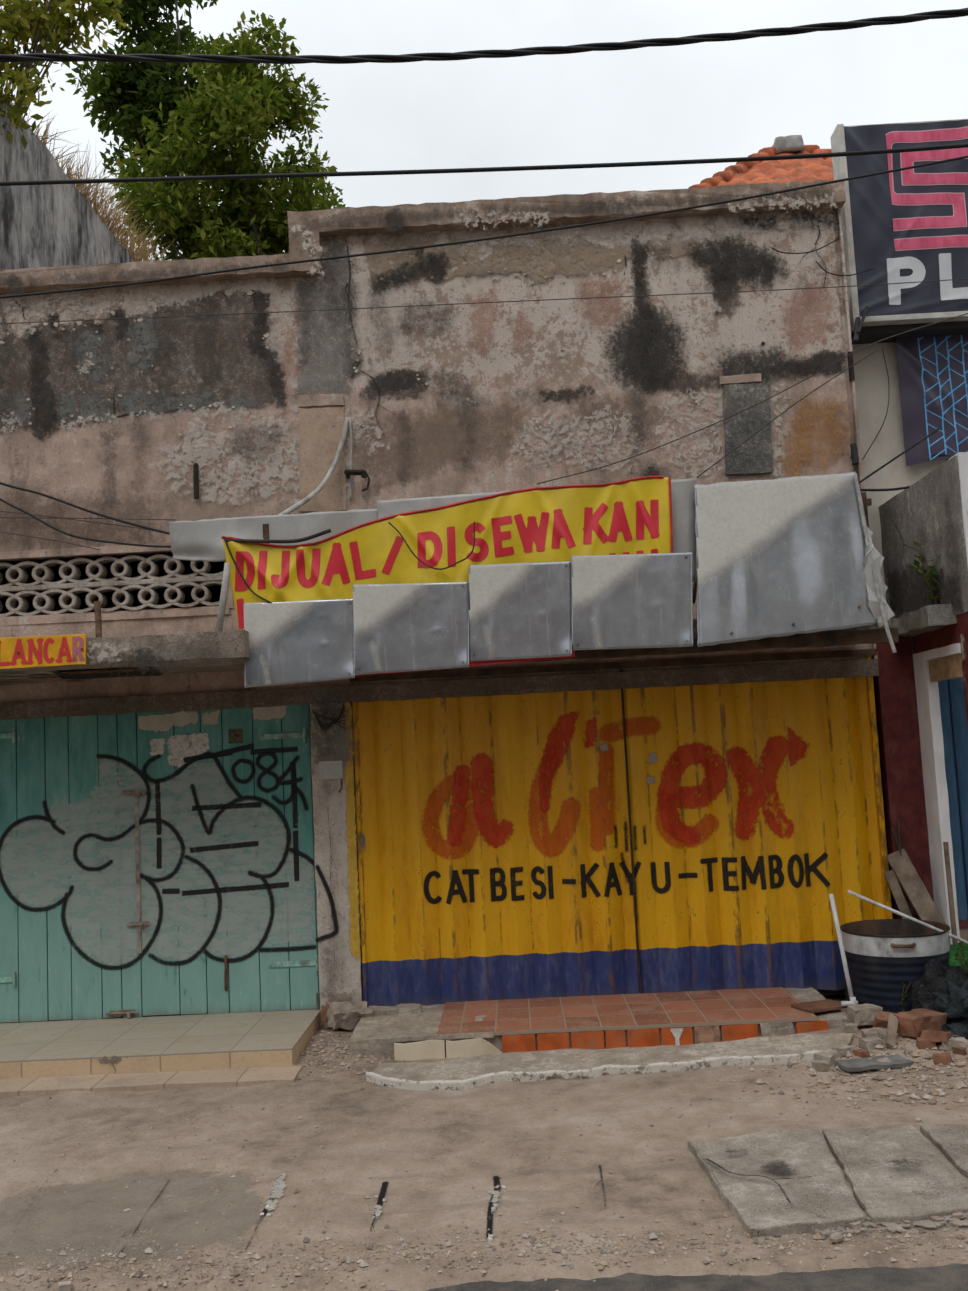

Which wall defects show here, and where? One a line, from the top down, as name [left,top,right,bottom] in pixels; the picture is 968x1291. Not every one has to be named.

peeling [291,225,324,276]
water stain [0,186,846,484]
peeling [363,192,839,351]